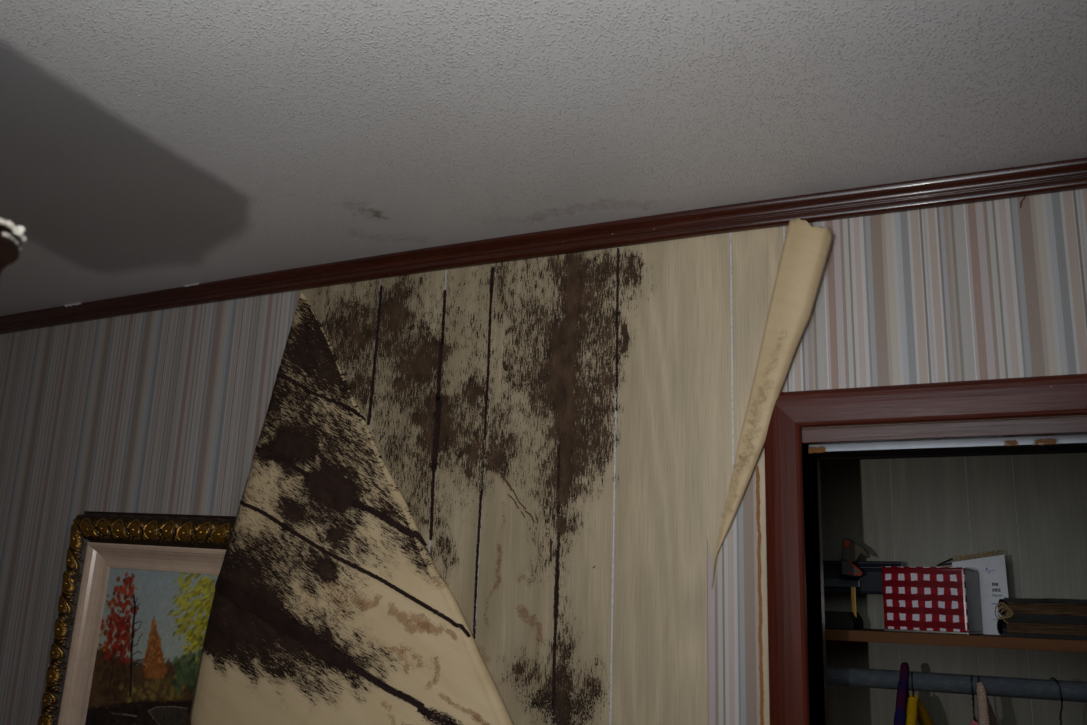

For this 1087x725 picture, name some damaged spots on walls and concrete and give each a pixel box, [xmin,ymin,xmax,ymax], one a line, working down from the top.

peeling [189,291,513,725]
water stain [201,248,657,725]